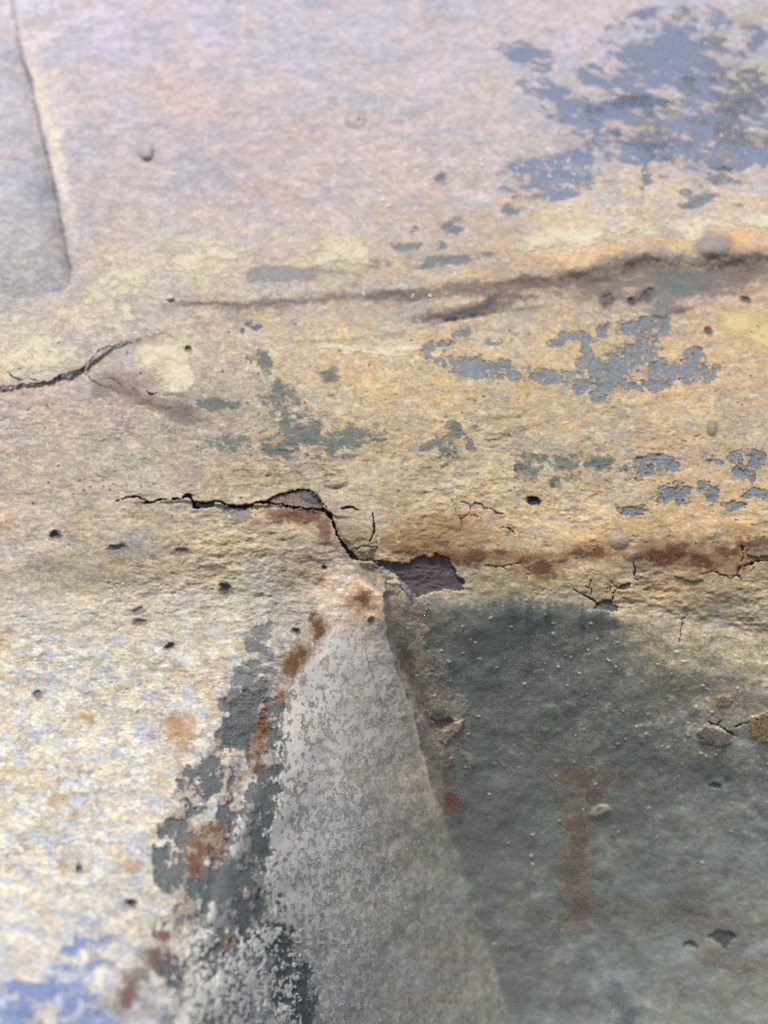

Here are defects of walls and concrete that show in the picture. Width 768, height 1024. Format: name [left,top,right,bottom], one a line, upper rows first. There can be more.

peeling [495,3,768,252]
leakage [368,252,768,323]
crack [0,344,122,393]
peeling [312,288,722,402]
peeling [616,447,768,518]
crack [118,489,377,560]
corrosion [395,541,506,568]
corrosion [519,545,604,574]
corrosion [629,536,768,570]
peeling [336,518,473,768]
peeling [152,612,462,1024]
leakage [394,592,768,1011]